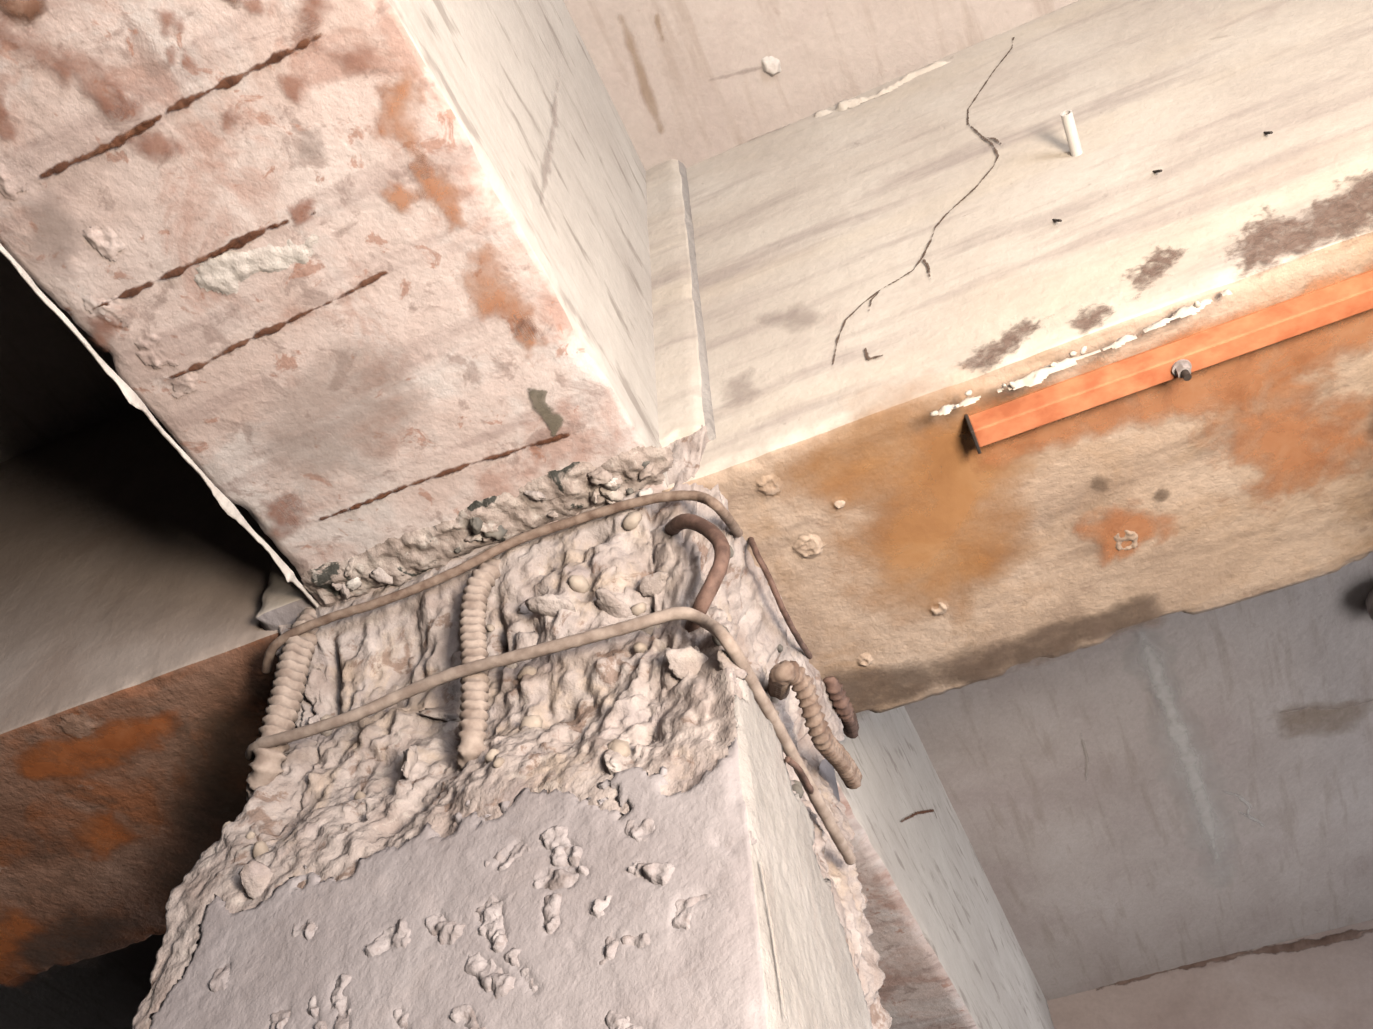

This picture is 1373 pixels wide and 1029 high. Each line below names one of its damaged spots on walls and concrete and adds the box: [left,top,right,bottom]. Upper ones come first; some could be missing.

peeling [0,0,46,23]
crack [40,33,321,178]
peeling [83,225,127,261]
crack [94,212,316,309]
rust [291,201,311,223]
rust [385,159,461,224]
damp [1129,248,1183,288]
damp [1230,173,1373,274]
crack [169,271,388,378]
damp [963,320,1038,370]
rust [811,308,1373,596]
spalling [0,234,892,1029]